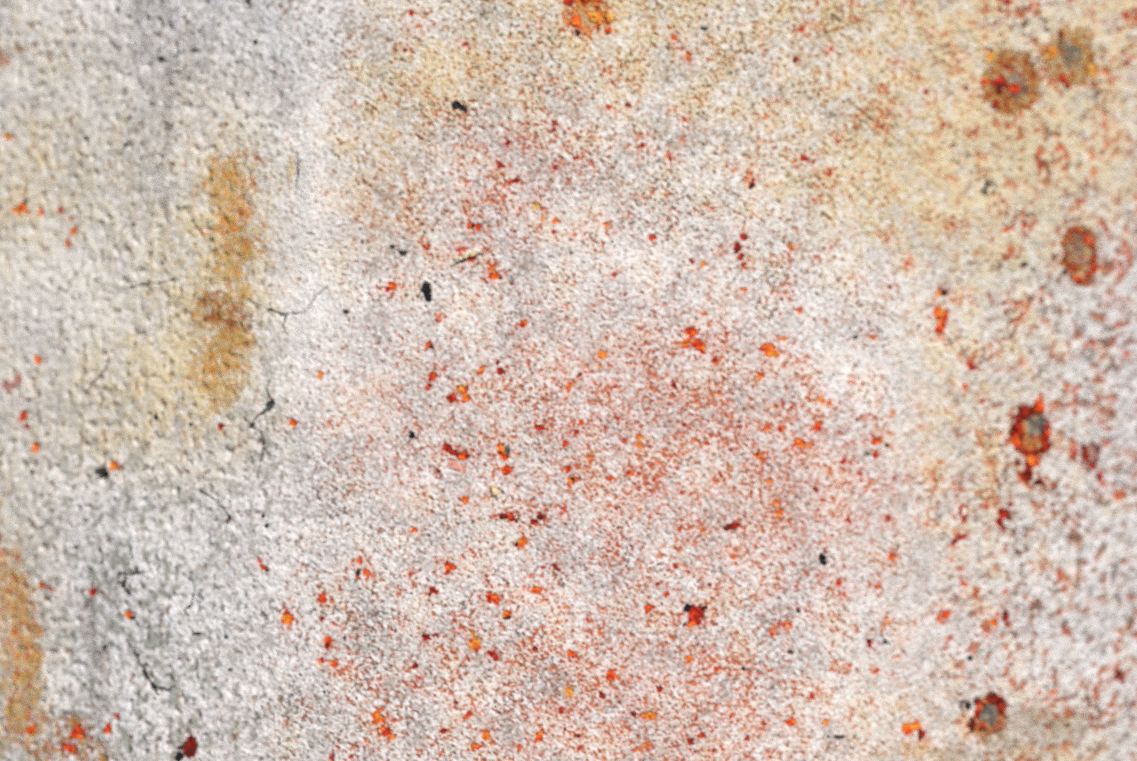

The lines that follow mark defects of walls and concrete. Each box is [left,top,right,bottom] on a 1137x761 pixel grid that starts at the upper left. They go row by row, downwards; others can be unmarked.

rust [561,0,615,41]
rust [965,23,1099,118]
rust [1058,222,1109,286]
rust [186,149,267,430]
rust [678,300,718,363]
rust [496,440,512,476]
rust [1007,396,1062,486]
rust [490,509,546,548]
rust [486,592,513,619]
rust [0,522,120,761]
rust [901,720,926,741]
rust [967,692,1008,737]